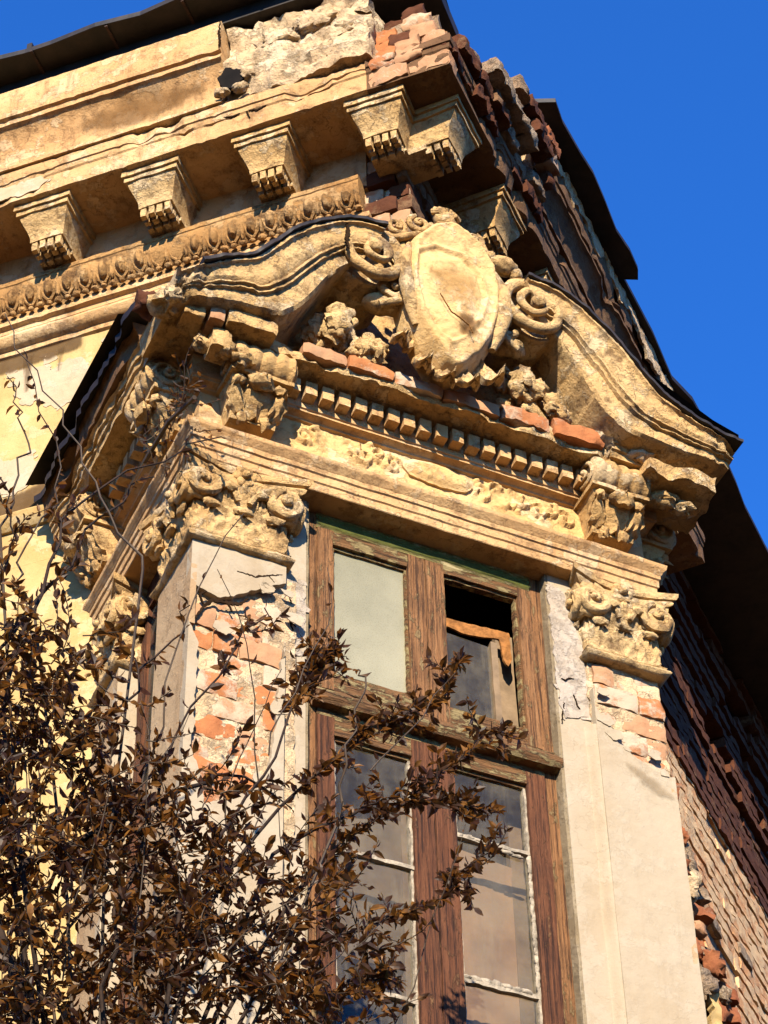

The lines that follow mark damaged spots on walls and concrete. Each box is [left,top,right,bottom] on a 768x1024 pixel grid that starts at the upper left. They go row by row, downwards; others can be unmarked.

crack [440,293,474,333]
crack [195,571,296,631]
spalling [190,576,311,845]
spalling [545,583,681,810]
spalling [682,826,742,1024]